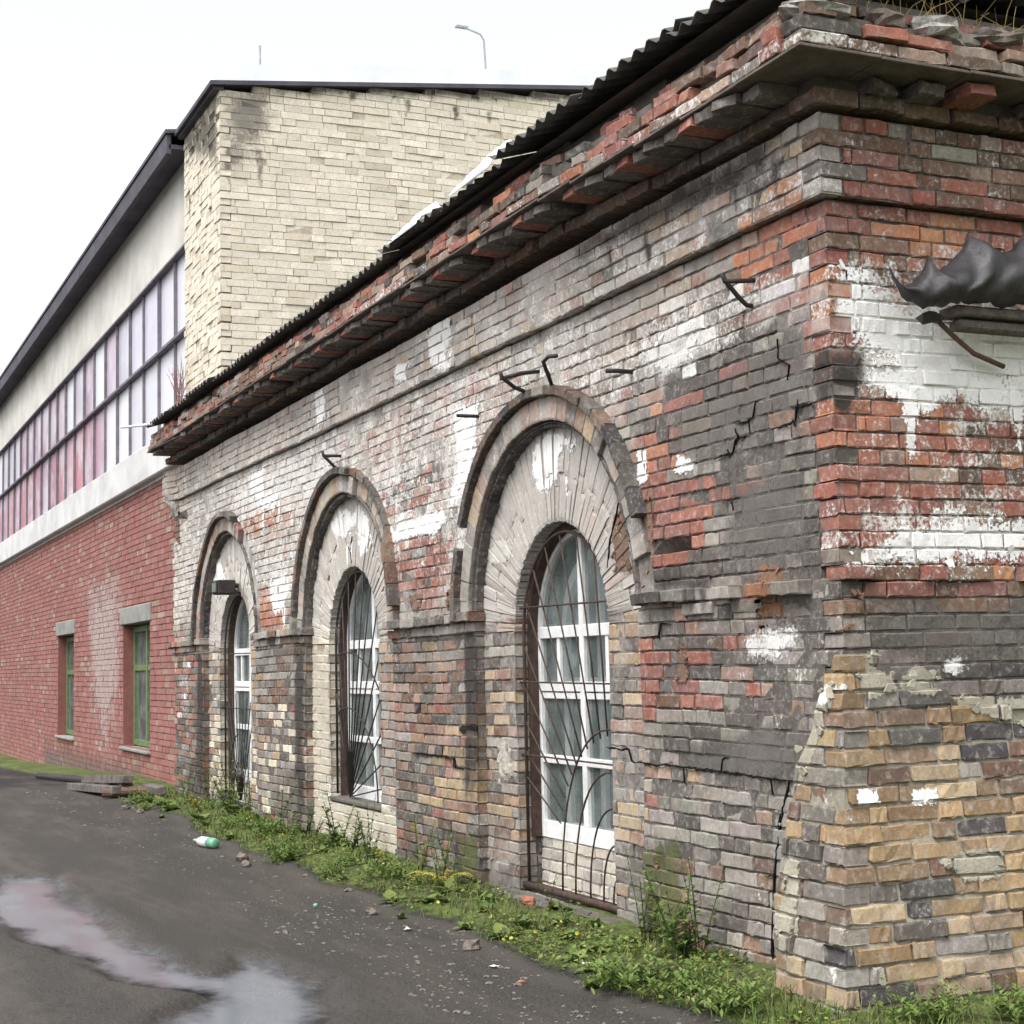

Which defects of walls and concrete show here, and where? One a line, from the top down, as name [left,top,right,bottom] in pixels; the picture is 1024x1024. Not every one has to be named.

water stain [186,90,267,169]
peeling [314,388,326,432]
peeling [394,362,407,383]
peeling [426,317,454,372]
crack [714,339,817,459]
peeling [828,259,1024,470]
peeling [391,400,479,542]
spalling [611,505,633,574]
peeling [846,502,1024,583]
peeling [817,681,847,706]
peeling [883,657,962,697]
crack [606,747,793,959]